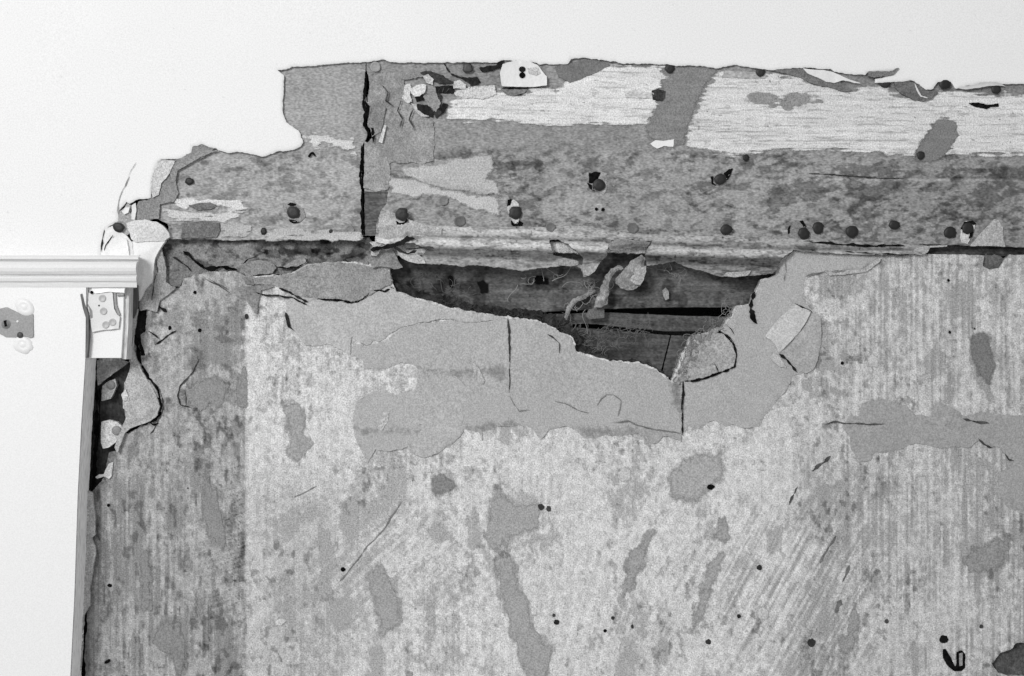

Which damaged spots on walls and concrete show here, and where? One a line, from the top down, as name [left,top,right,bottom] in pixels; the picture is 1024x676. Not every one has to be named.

crack [359,75,433,254]
peeling [398,59,1024,186]
peeling [100,102,882,463]
peeling [913,245,947,255]
peeling [960,219,1005,270]
crack [126,260,199,434]
crack [507,319,526,412]